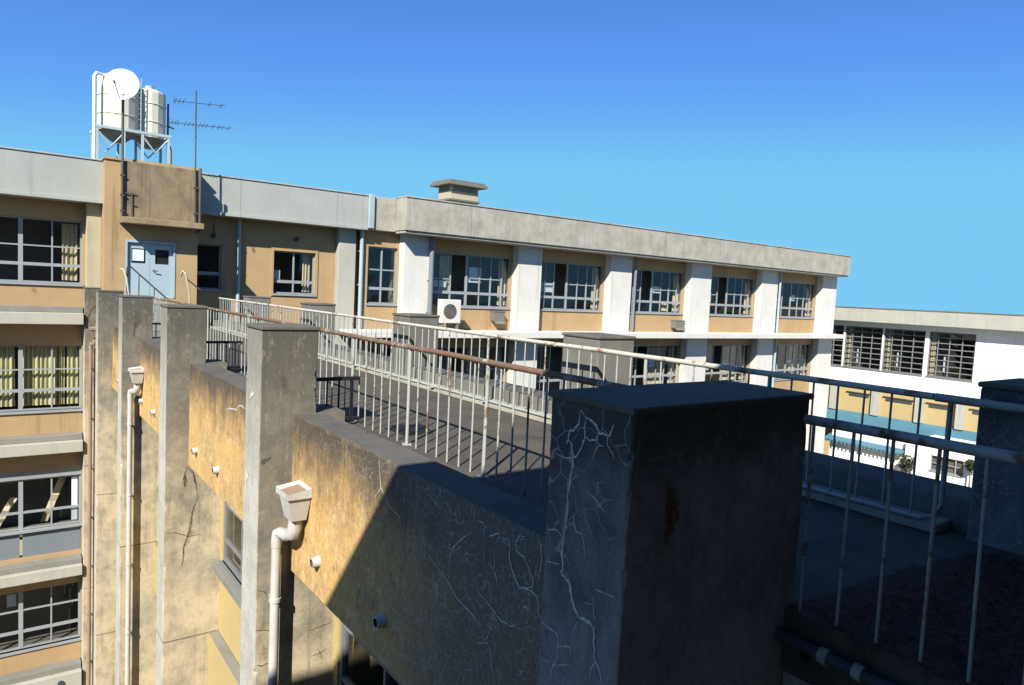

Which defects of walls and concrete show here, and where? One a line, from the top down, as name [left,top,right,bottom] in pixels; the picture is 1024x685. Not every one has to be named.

crack [174,468,200,565]
crack [431,410,614,683]